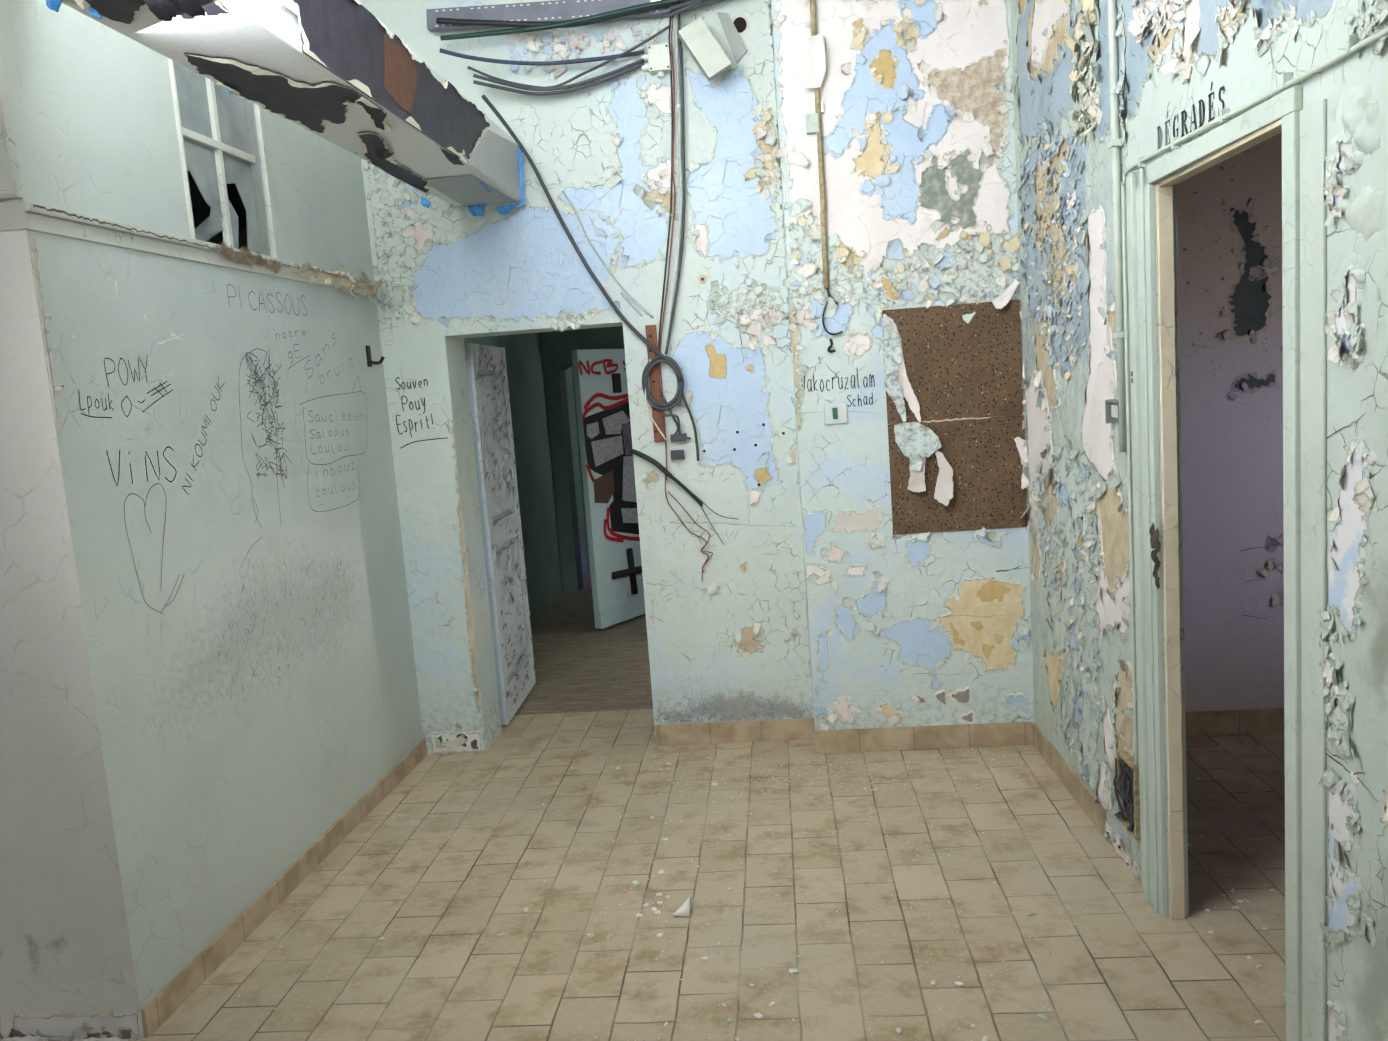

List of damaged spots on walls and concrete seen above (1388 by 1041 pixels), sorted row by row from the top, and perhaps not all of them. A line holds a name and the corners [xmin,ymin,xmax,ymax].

crack [0,200,370,284]
peeling [287,0,1388,952]
spalling [0,1010,143,1041]
peeling [1326,1000,1349,1041]